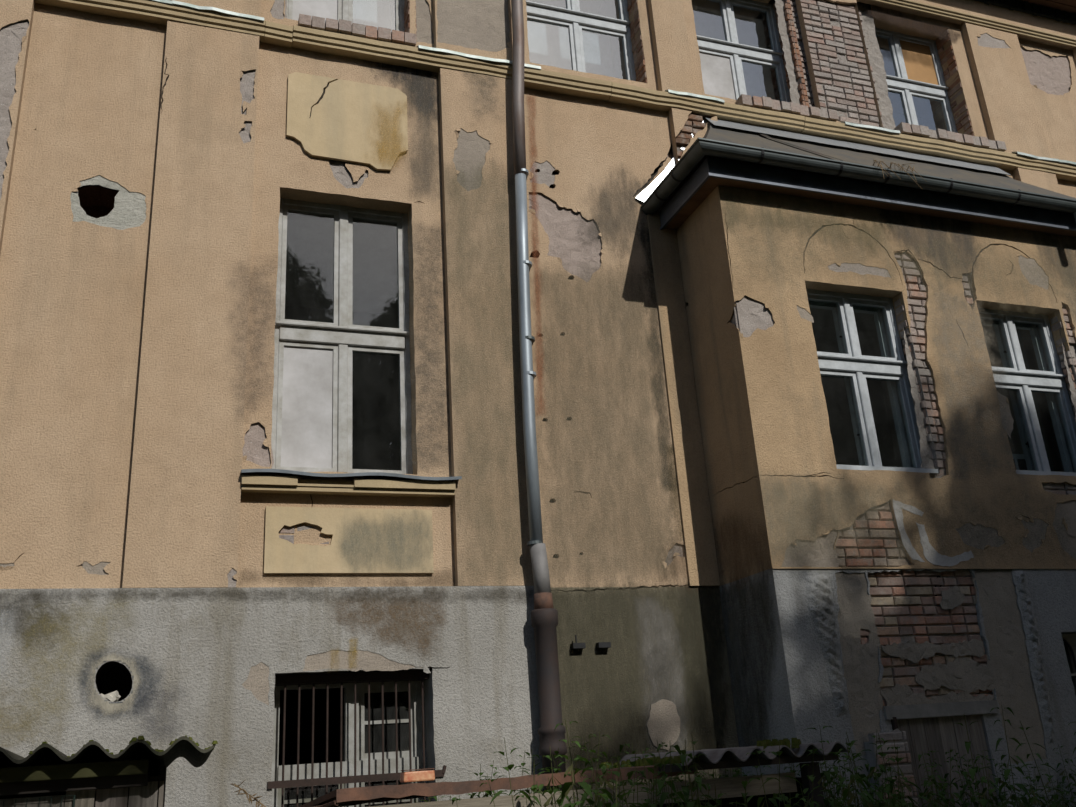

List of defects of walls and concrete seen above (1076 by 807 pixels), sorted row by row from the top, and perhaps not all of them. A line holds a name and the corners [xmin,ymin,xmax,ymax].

flaking render [0,20,29,200]
flaking render [70,175,146,230]
flaking render [453,128,493,191]
flaking render [529,161,604,282]
flaking render [977,33,1073,95]
leakage [597,179,679,496]
flaking render [729,296,774,338]
flaking render [1050,304,1076,422]
flaking render [279,526,318,544]
leakage [81,654,156,715]
leakage [552,575,774,764]
flaking render [835,501,994,756]